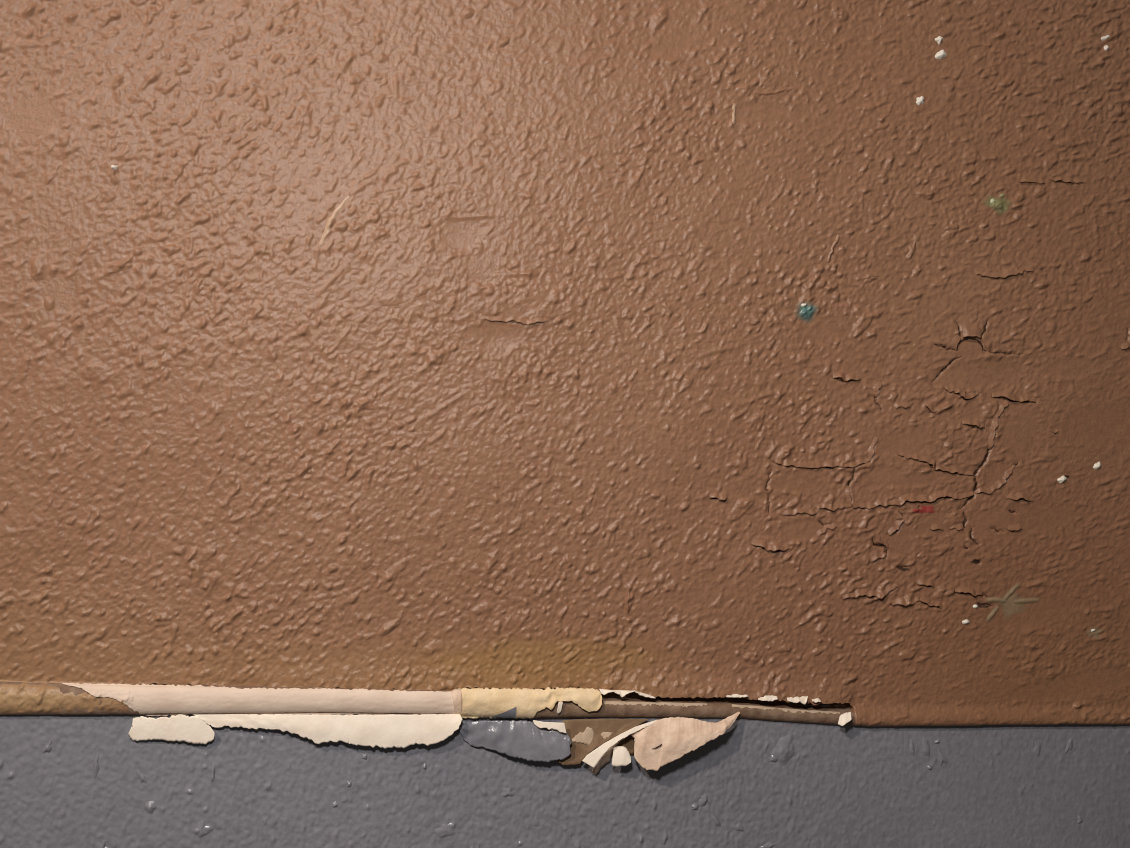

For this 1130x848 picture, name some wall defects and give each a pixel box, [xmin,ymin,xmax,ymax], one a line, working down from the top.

crack [481,315,548,325]
crack [752,320,1036,608]
peeling [62,683,855,774]